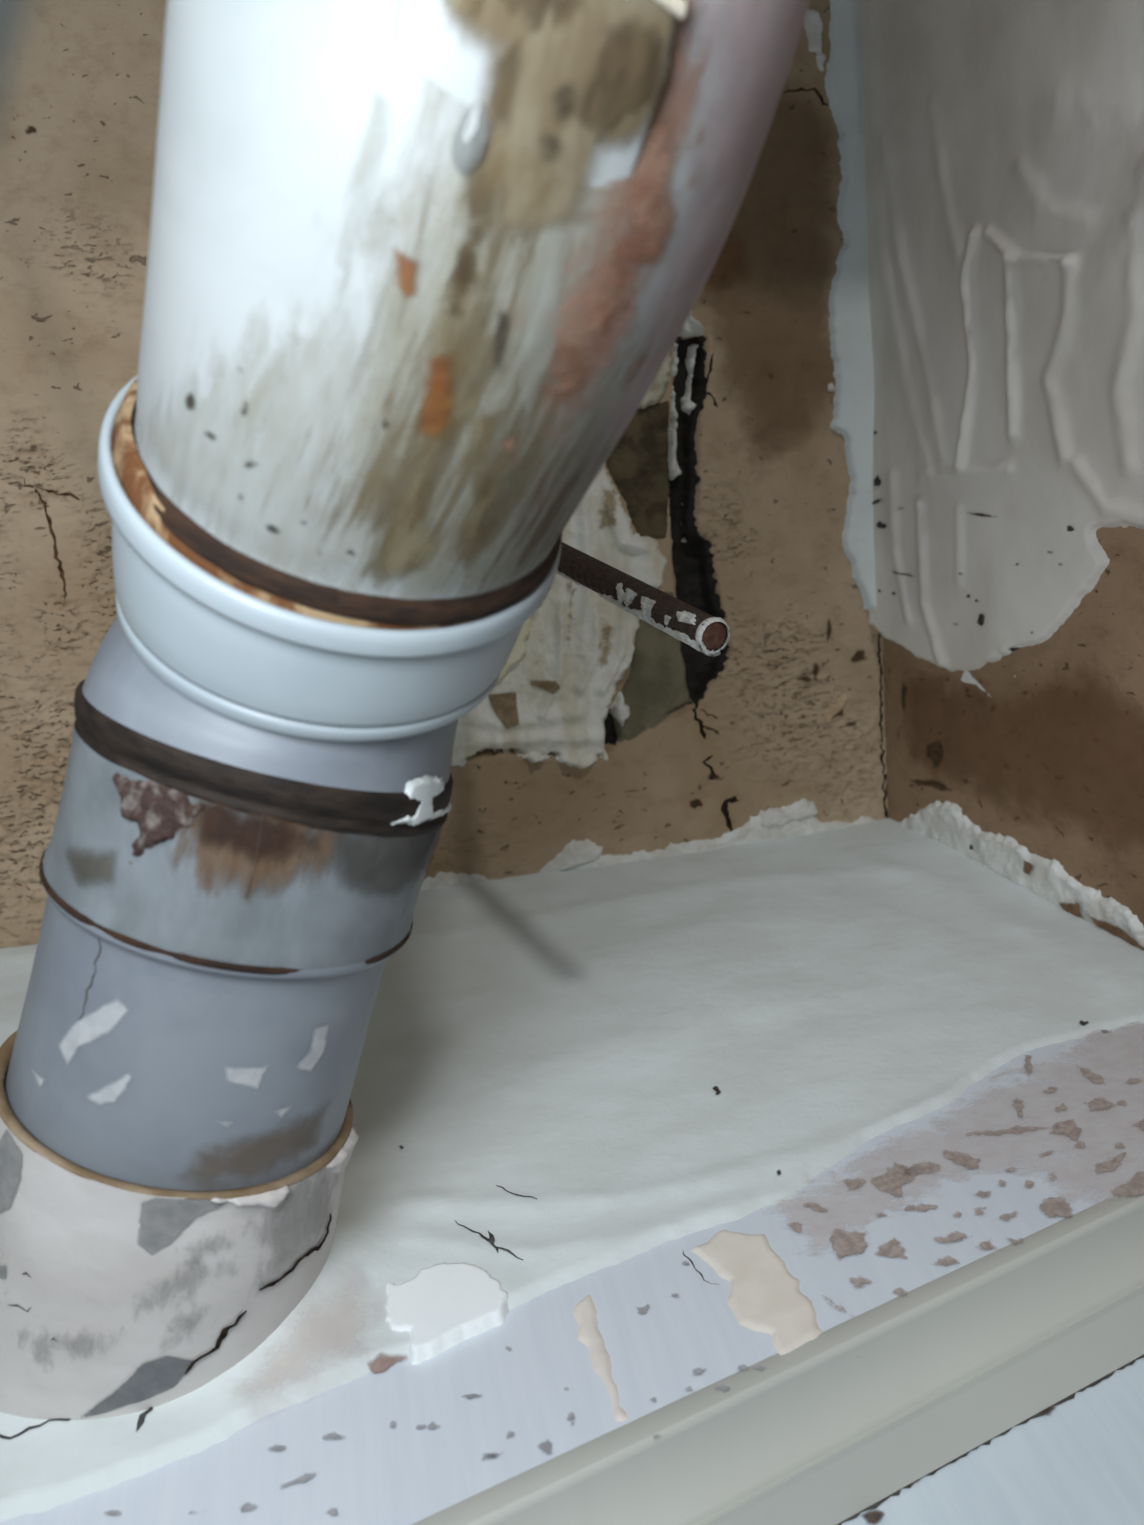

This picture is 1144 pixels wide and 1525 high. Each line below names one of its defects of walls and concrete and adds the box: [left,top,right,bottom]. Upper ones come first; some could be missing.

rust [397,254,416,295]
spalling [561,311,727,620]
spalling [451,574,729,769]
crack [688,701,739,832]
rust [112,772,334,890]
crack [185,1213,332,1375]
peeling [369,1262,509,1373]
crack [455,1221,523,1260]
peeling [830,1229,907,1259]
peeling [934,1167,1072,1265]
crack [0,1418,71,1440]
crack [136,1407,153,1431]